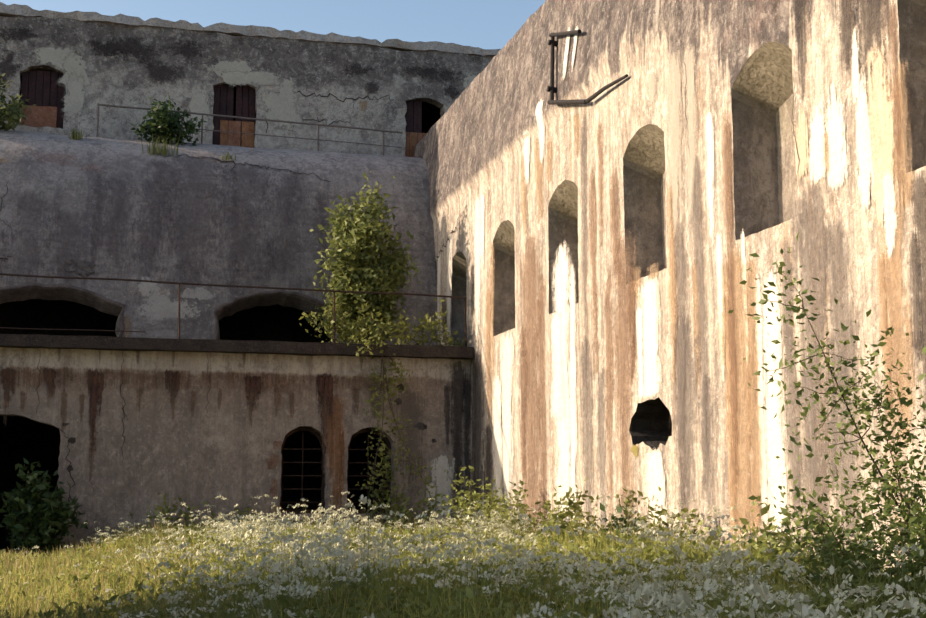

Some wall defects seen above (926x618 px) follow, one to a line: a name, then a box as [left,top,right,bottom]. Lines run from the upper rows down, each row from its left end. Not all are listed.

crack [160,154,330,182]
rust [1,368,16,409]
rust [43,368,56,396]
rust [87,370,104,452]
crack [120,351,128,462]
rust [165,370,181,407]
rust [244,376,262,408]